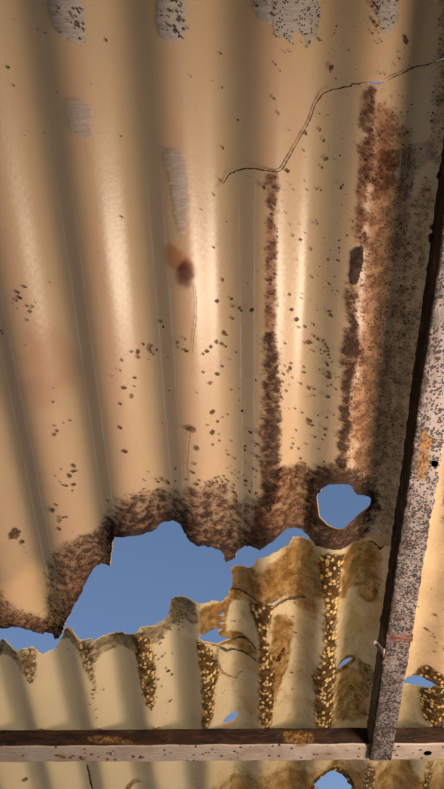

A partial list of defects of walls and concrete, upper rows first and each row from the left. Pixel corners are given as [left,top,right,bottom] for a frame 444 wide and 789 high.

water stain [159,0,189,39]
crack [388,61,435,81]
crack [219,82,365,185]
water stain [0,84,437,639]
crack [231,587,307,608]
crack [216,636,258,679]